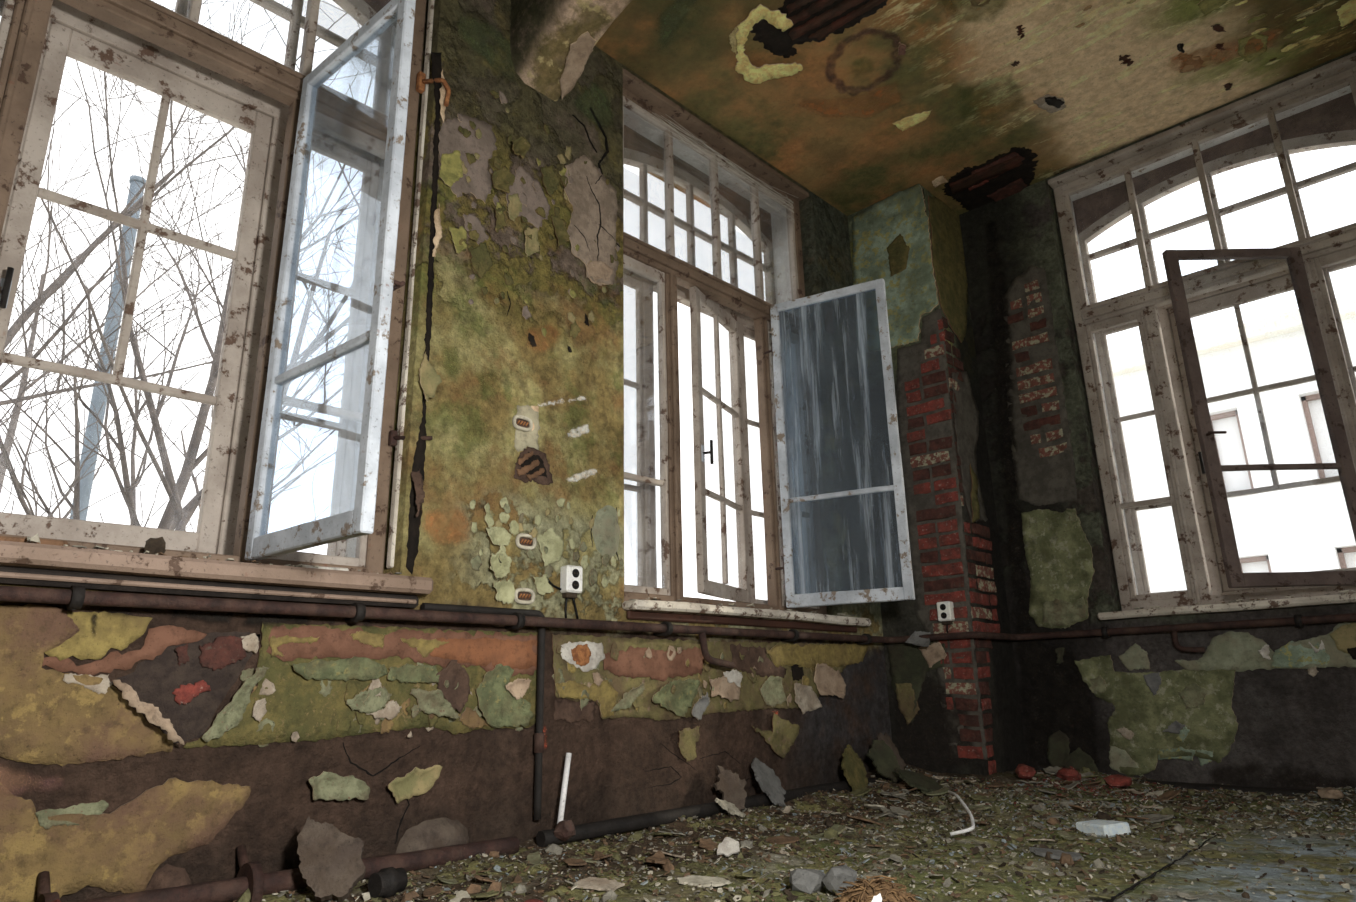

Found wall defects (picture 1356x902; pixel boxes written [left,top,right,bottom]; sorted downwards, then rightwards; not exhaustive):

spalling [729,0,888,84]
damp [801,29,906,116]
spalling [406,52,620,574]
spalling [852,147,1039,775]
spalling [1002,265,1095,628]
peeling [1047,621,1356,777]
peeling [308,771,370,801]
peeling [388,765,442,804]
peeling [0,777,251,902]
spalling [677,875,730,887]
spalling [717,837,740,857]